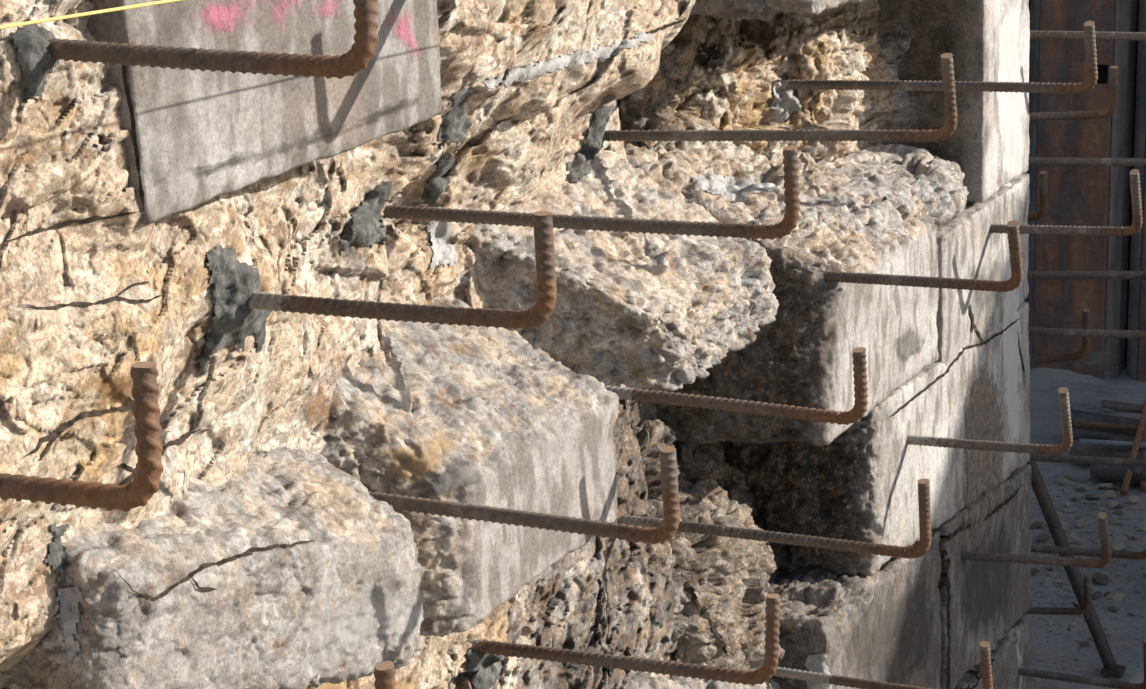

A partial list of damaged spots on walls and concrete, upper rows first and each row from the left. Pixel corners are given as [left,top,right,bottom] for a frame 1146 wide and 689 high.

spalling [48,0,379,79]
crack [4,65,144,242]
spalling [248,21,1146,329]
crack [18,281,165,309]
crack [25,407,133,461]
spalling [0,361,164,512]
spalling [604,347,868,425]
crack [890,301,1025,417]
spalling [368,446,932,559]
crack [114,540,315,600]
spalling [466,594,934,689]
crack [938,484,1023,689]